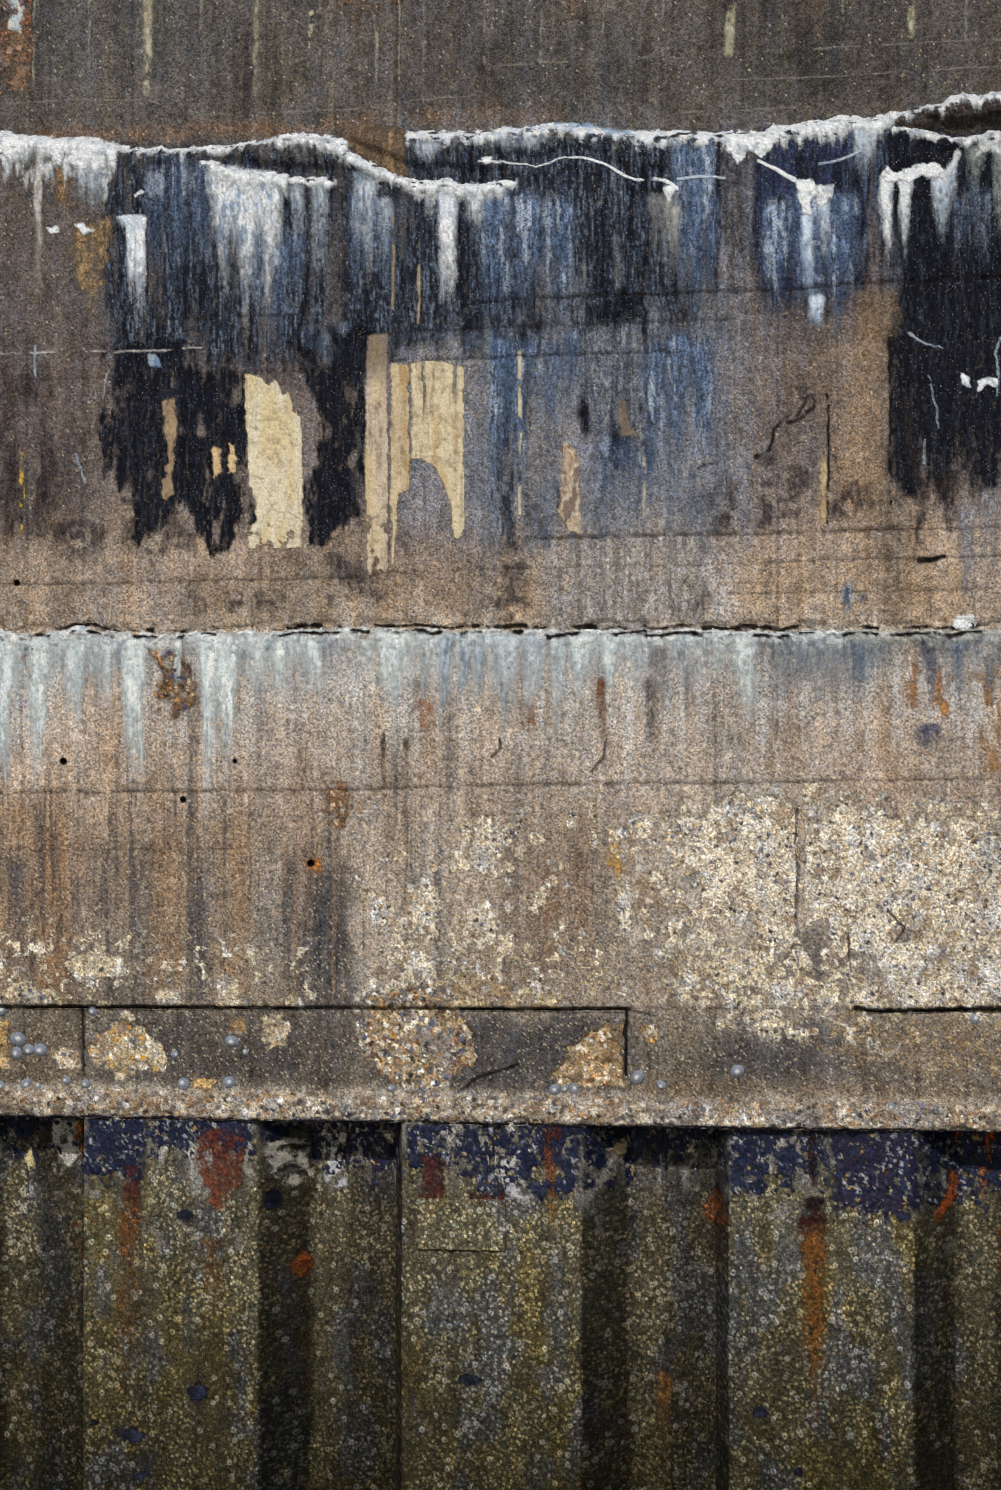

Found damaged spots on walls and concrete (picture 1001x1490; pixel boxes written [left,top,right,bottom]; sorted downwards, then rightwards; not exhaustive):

peeling [211,374,304,549]
peeling [364,333,466,575]
leakage [0,91,1001,795]
spalling [148,647,198,718]
rust [904,654,950,714]
rust [972,667,1001,773]
spalling [0,773,1001,1208]
rust [117,1165,140,1334]
rust [191,1127,246,1209]
rust [798,1135,829,1412]